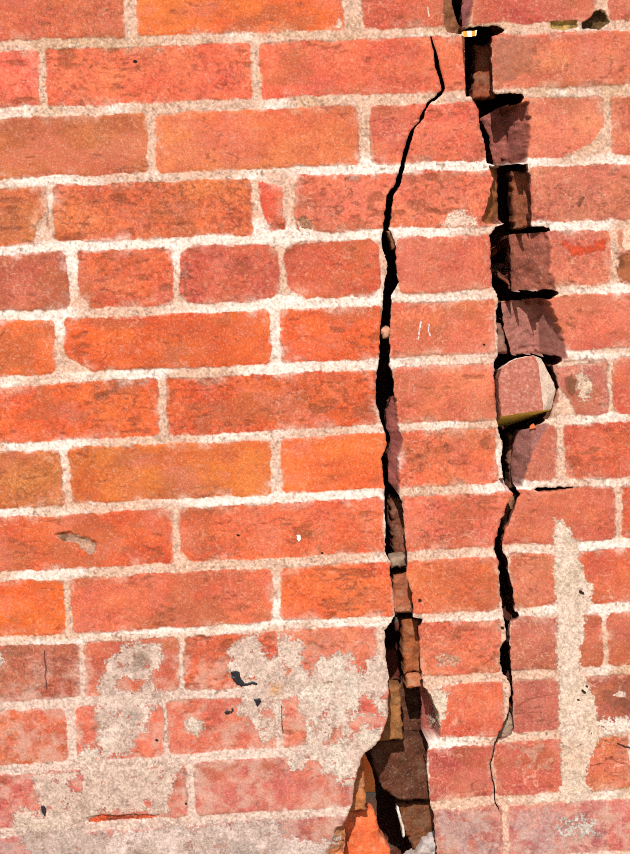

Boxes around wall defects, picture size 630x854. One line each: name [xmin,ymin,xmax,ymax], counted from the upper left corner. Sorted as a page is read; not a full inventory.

crack [343,0,562,854]
spalling [88,814,157,823]
spalling [329,820,346,854]